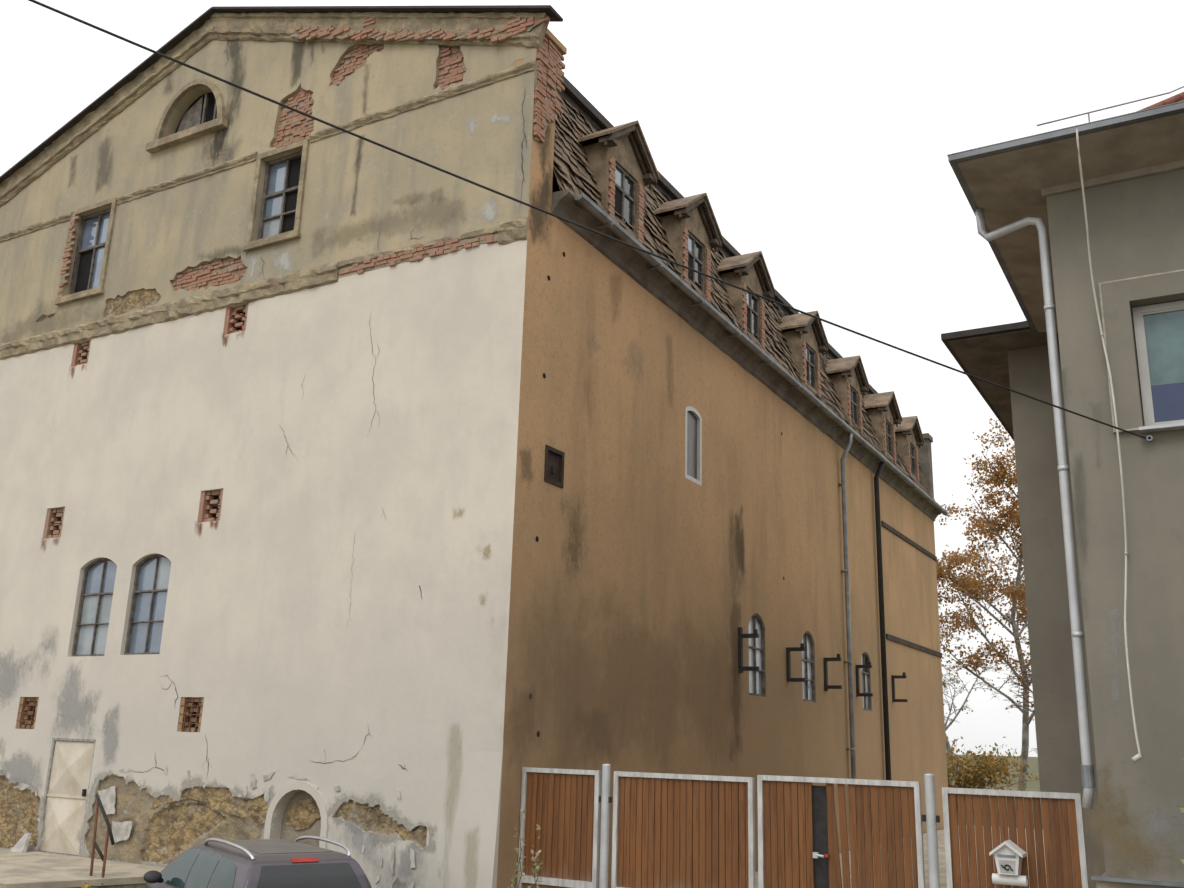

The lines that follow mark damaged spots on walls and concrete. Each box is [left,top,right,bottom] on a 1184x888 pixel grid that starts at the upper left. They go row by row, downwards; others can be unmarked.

spalling [289,16,565,143]
spalling [272,88,314,154]
spalling [37,216,81,322]
spalling [105,289,161,317]
spalling [172,257,248,291]
spalling [338,234,498,275]
crack [369,315,380,431]
leakage [59,670,92,730]
leakage [104,709,117,759]
spalling [0,770,44,852]
spalling [77,766,441,888]